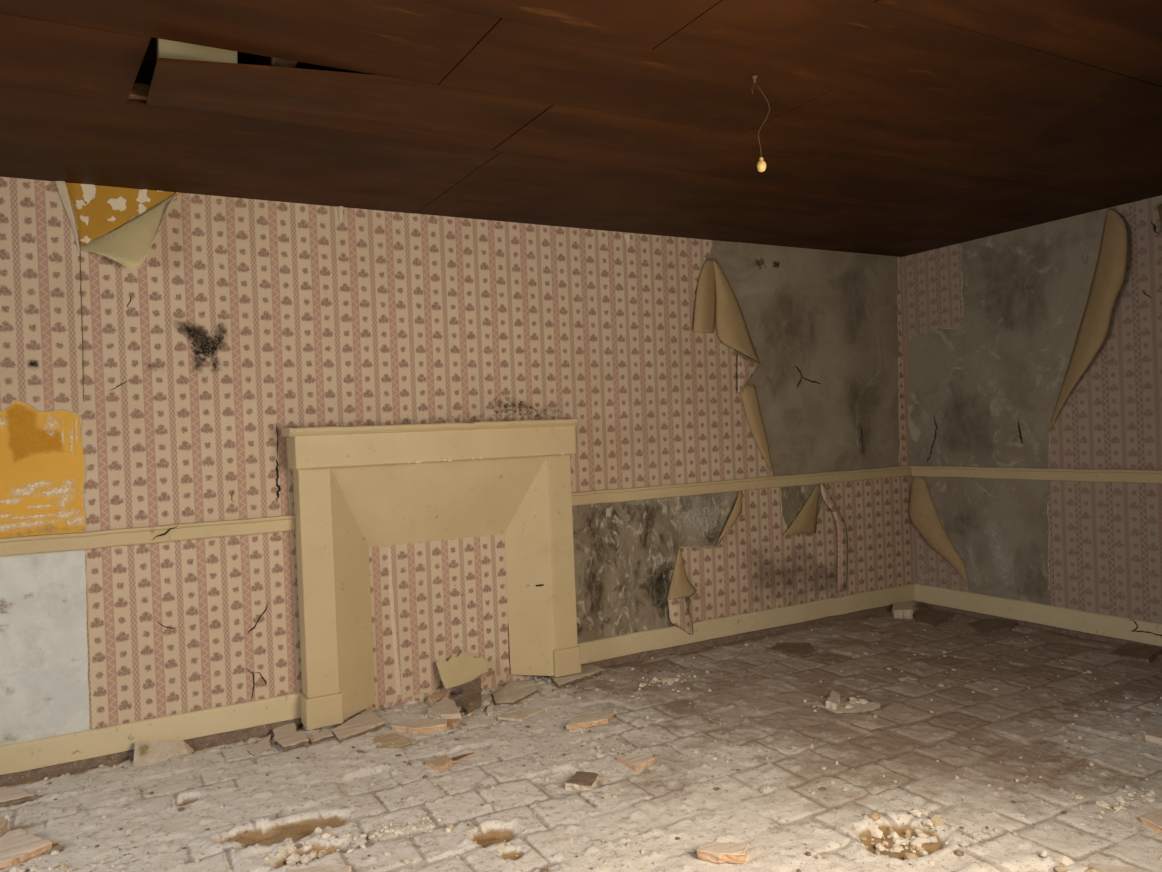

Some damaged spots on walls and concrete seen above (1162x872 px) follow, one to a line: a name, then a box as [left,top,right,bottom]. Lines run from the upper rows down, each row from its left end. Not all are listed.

peeling [75,184,163,244]
peeling [0,400,87,538]
water stain [179,322,224,370]
crack [795,366,821,387]
flaking render [708,207,1115,605]
flaking render [0,550,90,745]